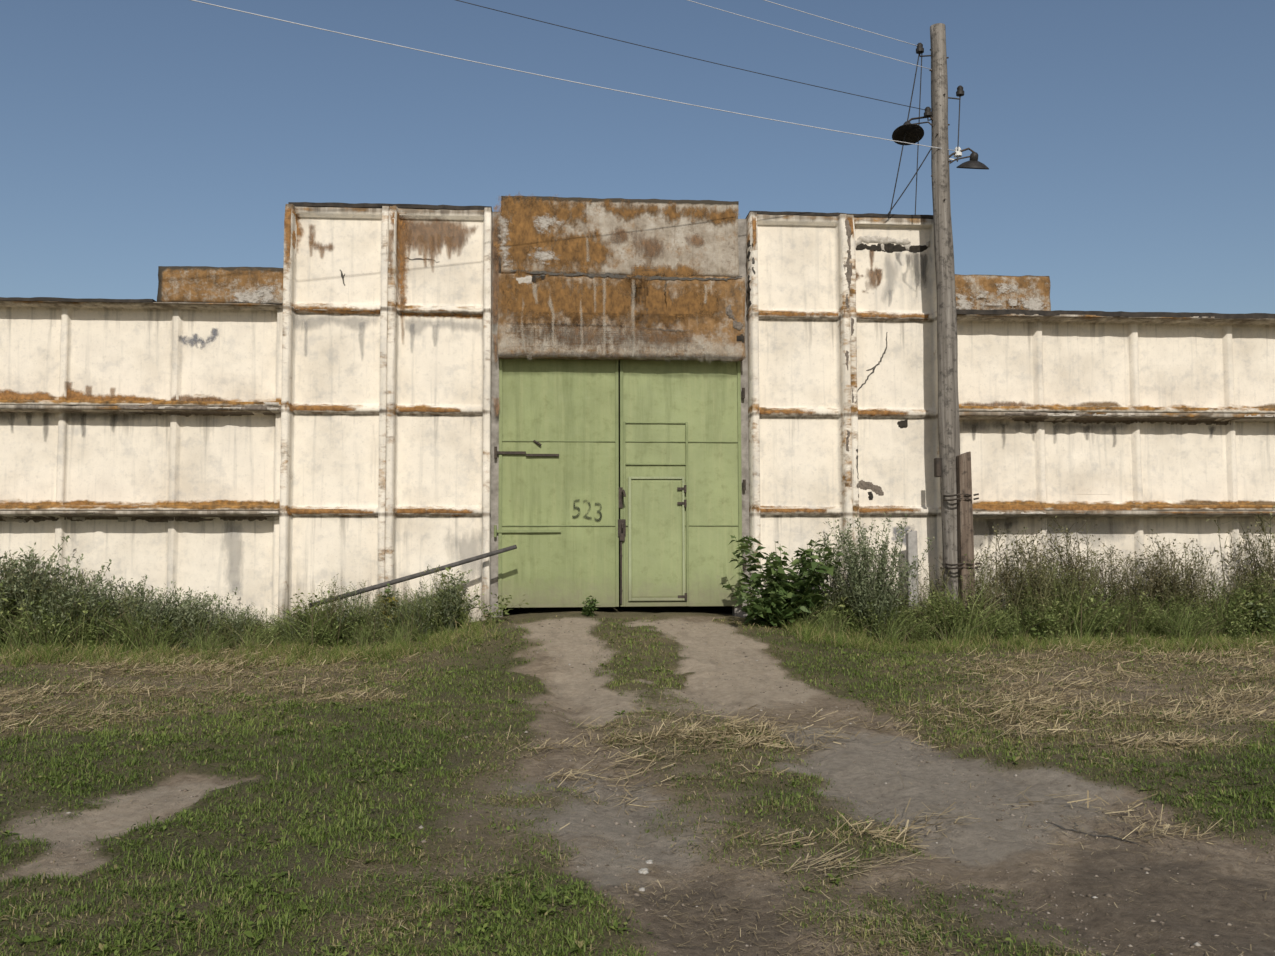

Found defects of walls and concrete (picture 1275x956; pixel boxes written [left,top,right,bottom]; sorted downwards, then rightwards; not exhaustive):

corrosion [748,217,757,247]
corrosion [389,195,738,360]
spalling [844,219,930,336]
crack [855,332,888,403]
corrosion [0,382,149,401]
spalling [850,478,884,500]
corrosion [60,501,138,509]
corrosion [973,504,1132,512]
corrosion [1150,500,1275,514]